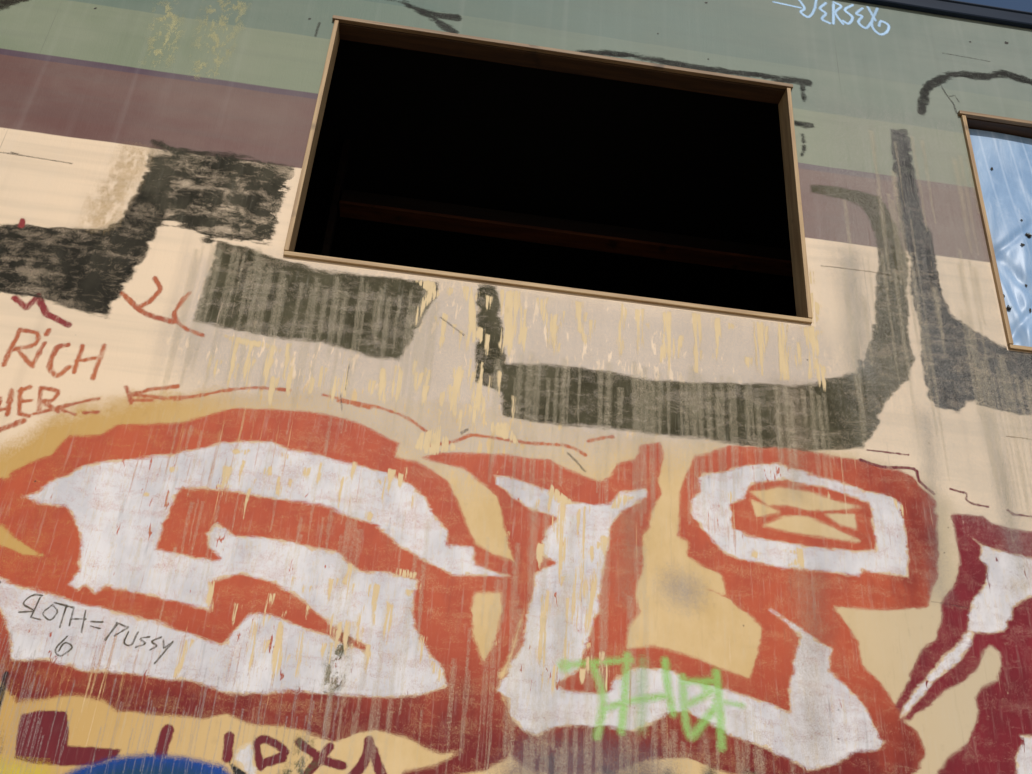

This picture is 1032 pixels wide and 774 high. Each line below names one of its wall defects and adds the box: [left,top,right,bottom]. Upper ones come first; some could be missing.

peeling [207,334,351,406]
peeling [367,280,596,455]
peeling [657,311,734,374]
peeling [744,271,827,392]